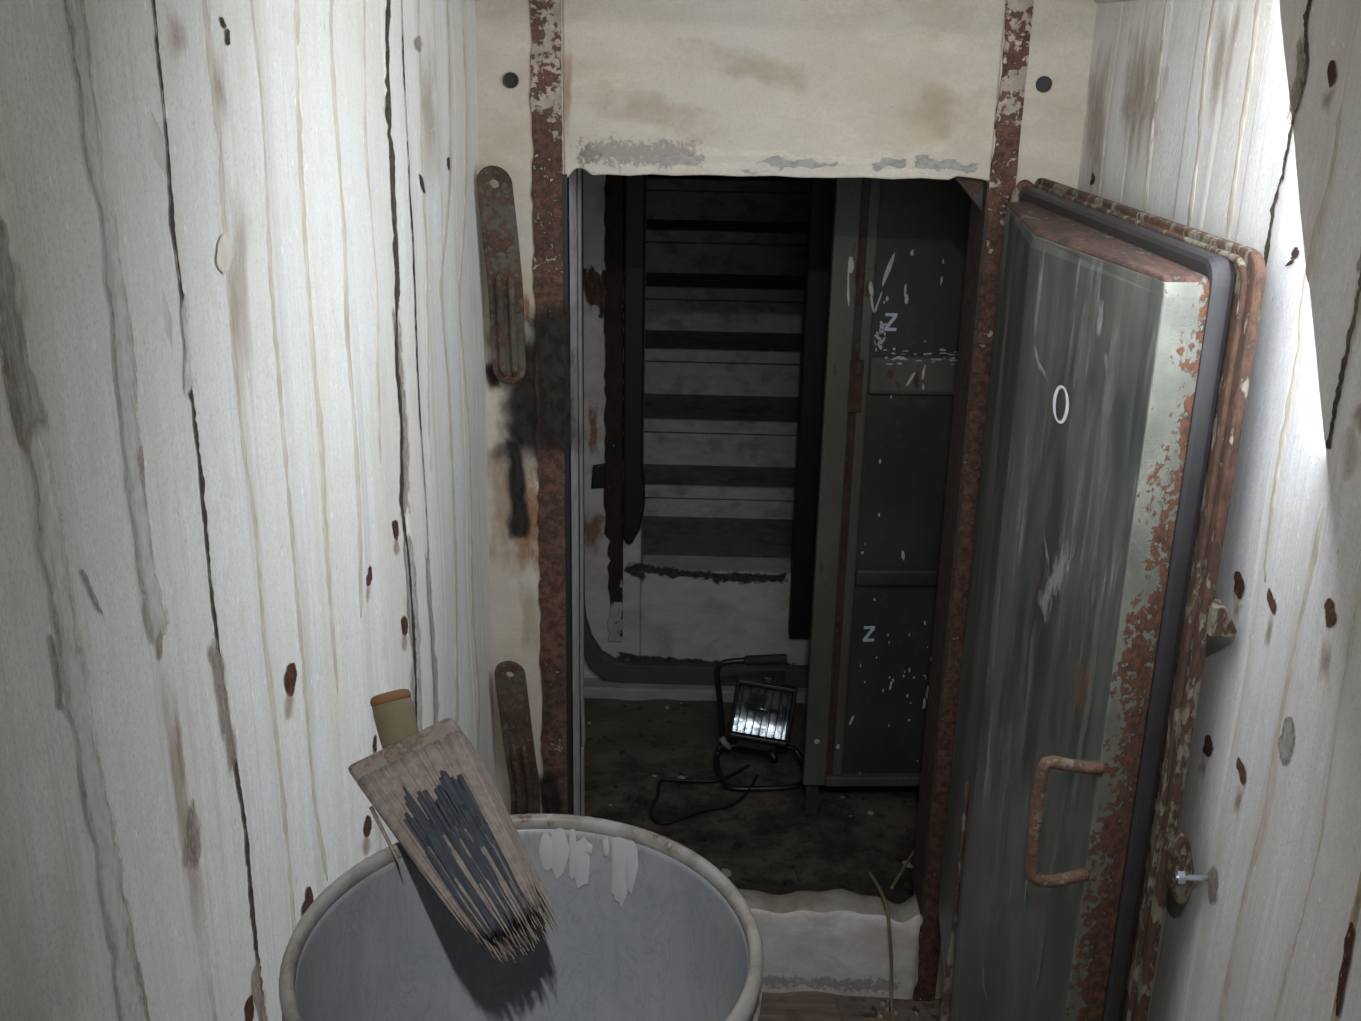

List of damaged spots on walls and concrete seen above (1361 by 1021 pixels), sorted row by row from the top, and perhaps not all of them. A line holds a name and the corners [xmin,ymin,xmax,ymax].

peeling [610,147,980,177]
crack [1326,255,1361,449]
crack [153,0,268,1021]
rust [518,488,539,558]
spalling [0,219,150,1021]
rust [1234,571,1245,611]
rust [1266,588,1276,637]
rust [1324,598,1337,628]
rust [1202,735,1213,757]
rust [1236,758,1246,804]